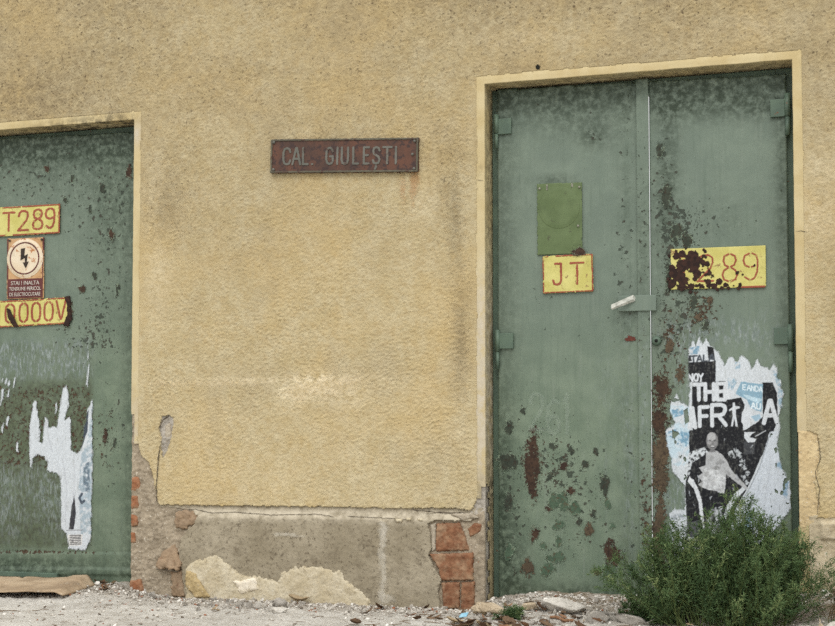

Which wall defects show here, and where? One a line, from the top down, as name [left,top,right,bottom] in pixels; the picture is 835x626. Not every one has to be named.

flaking render [130,414,371,606]
spalling [429,487,486,610]
corrosion [520,556,535,578]
corrosion [520,425,551,512]
corrosion [594,536,625,576]
corrosion [651,362,686,569]